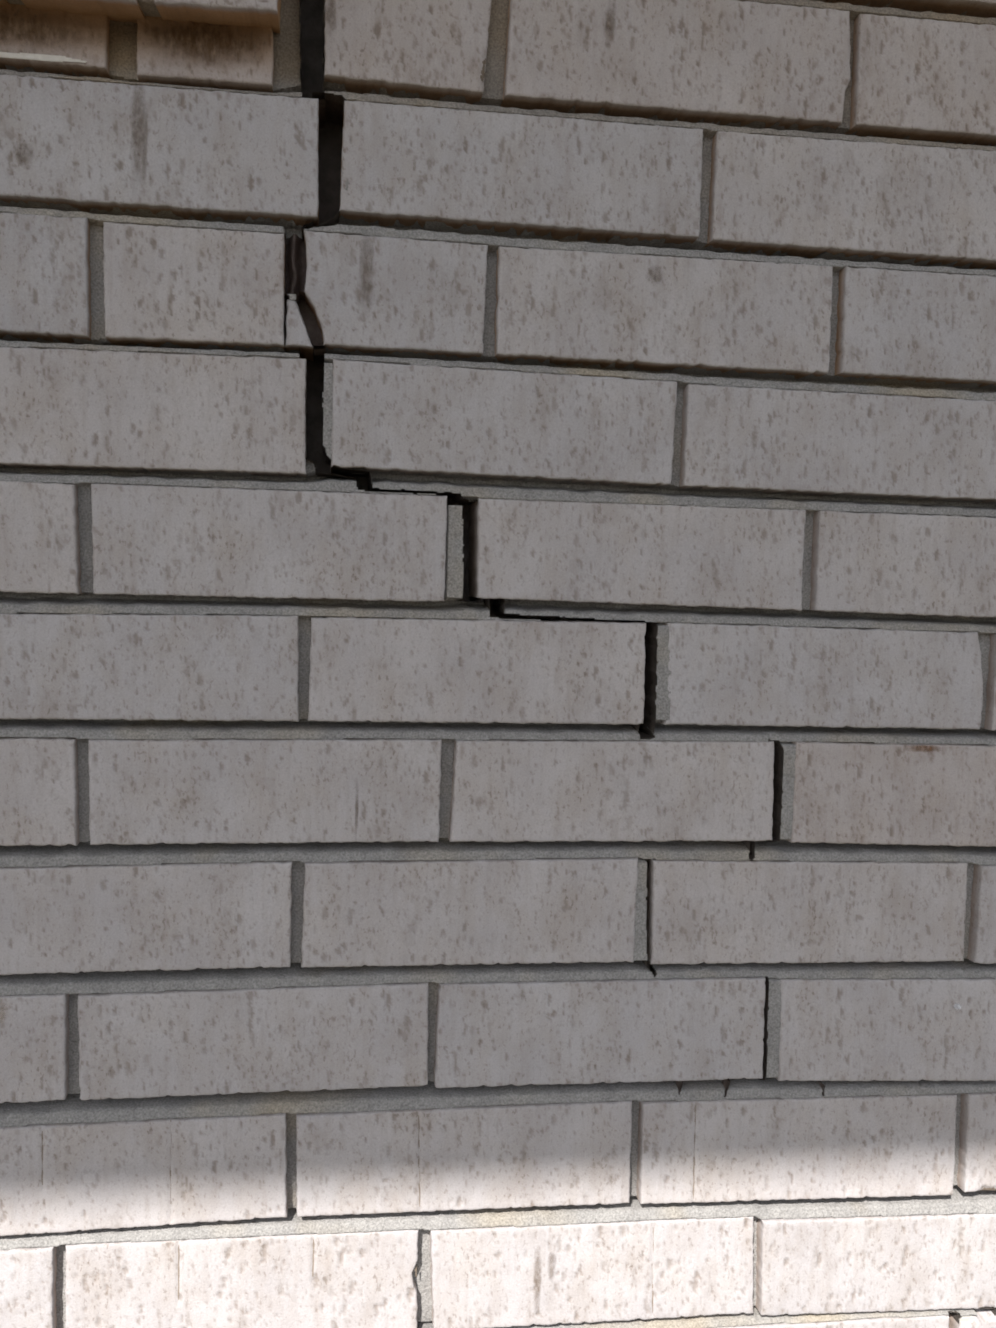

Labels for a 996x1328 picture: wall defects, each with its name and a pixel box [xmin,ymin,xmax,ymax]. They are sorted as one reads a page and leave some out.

crack [299,0,347,240]
crack [284,290,658,739]
crack [741,739,783,860]
crack [642,953,657,977]